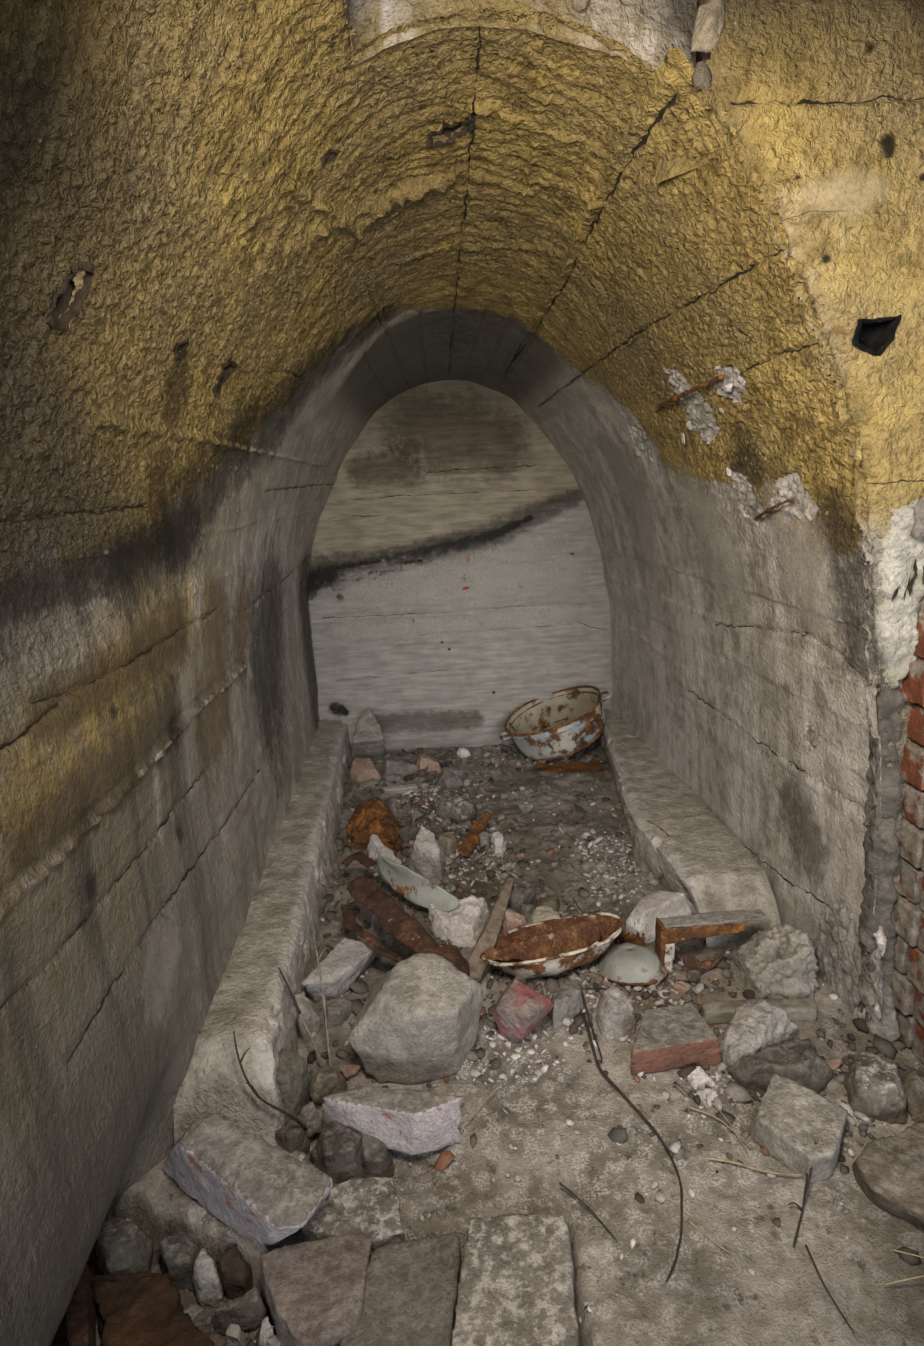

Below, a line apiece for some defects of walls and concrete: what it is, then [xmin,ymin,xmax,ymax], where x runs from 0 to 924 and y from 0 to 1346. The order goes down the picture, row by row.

spalling [59,260,87,328]
spalling [432,125,469,147]
crack [448,26,482,374]
crack [505,93,677,375]
crack [540,210,870,405]
crack [730,95,924,105]
crack [0,559,306,750]
water stain [307,515,533,600]
spalling [663,365,750,445]
spalling [726,467,821,526]
peeling [863,500,924,688]
crack [67,770,260,1064]